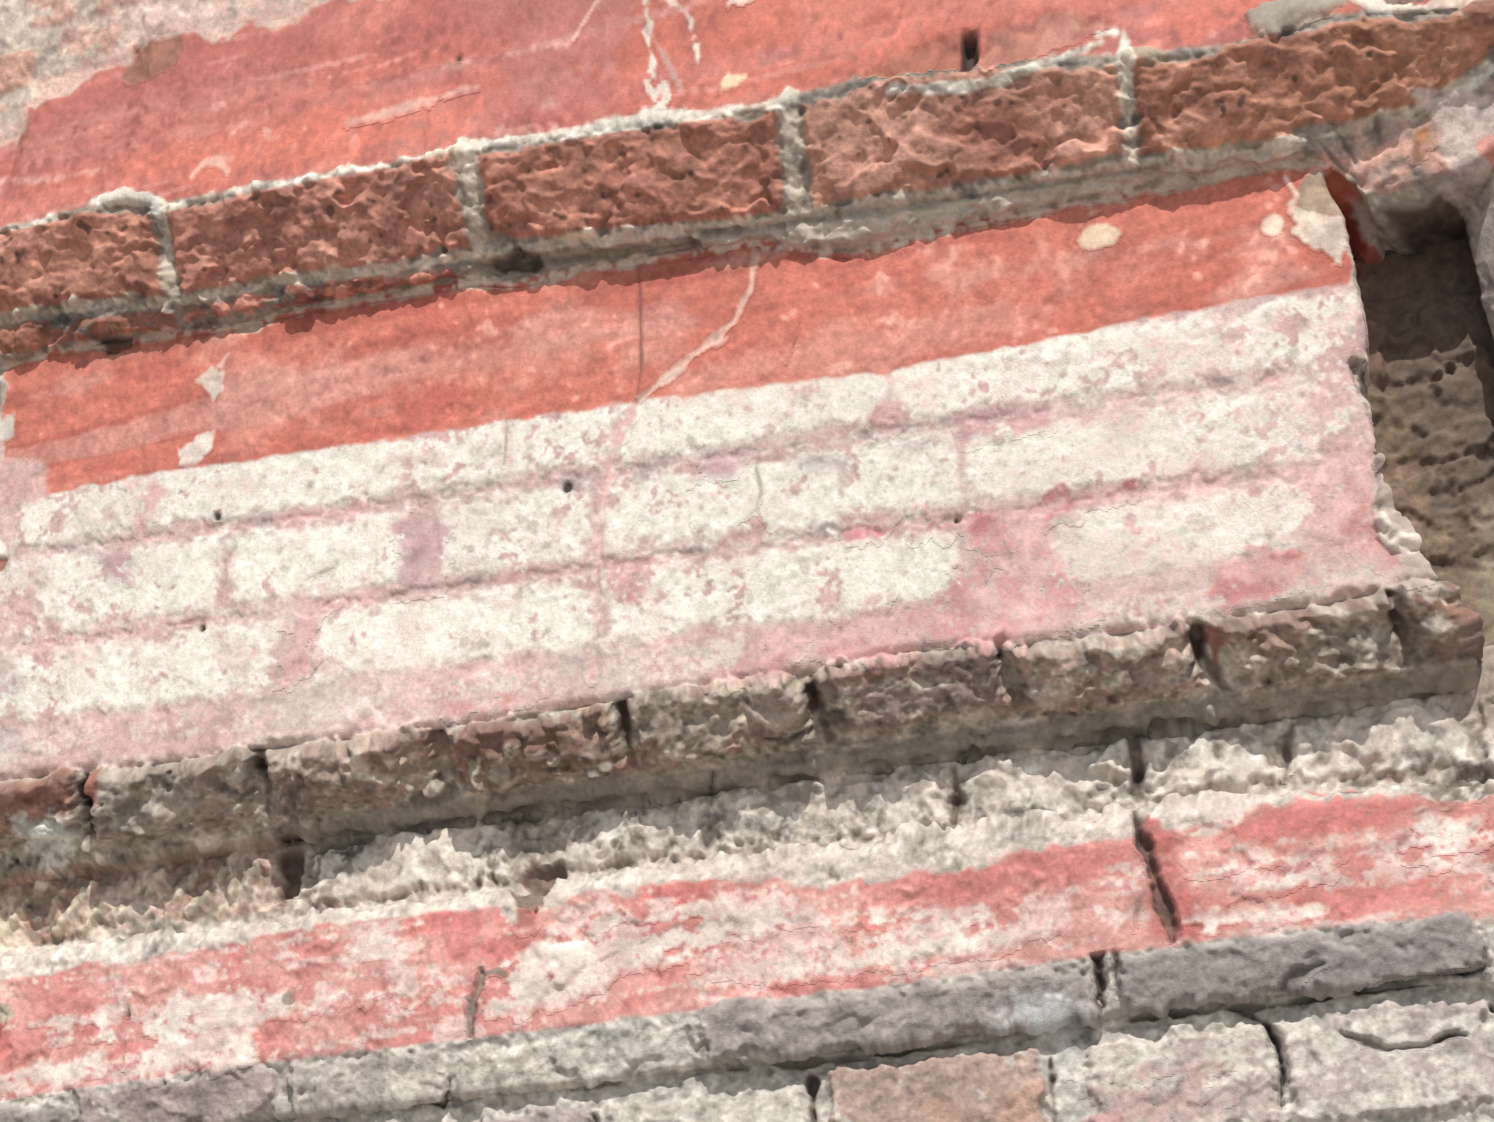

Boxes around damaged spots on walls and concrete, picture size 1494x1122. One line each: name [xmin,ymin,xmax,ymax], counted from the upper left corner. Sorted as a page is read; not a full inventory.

peeling [640,0,707,110]
spalling [859,6,1120,80]
spalling [1349,0,1435,15]
peeling [1258,169,1442,591]
crack [580,247,762,688]
crack [737,464,772,534]
peeling [1199,543,1332,667]
crack [1129,808,1183,946]
peeling [1145,790,1350,937]
peeling [1397,758,1494,876]
peeling [0,919,430,1104]
peeling [482,889,1068,1024]